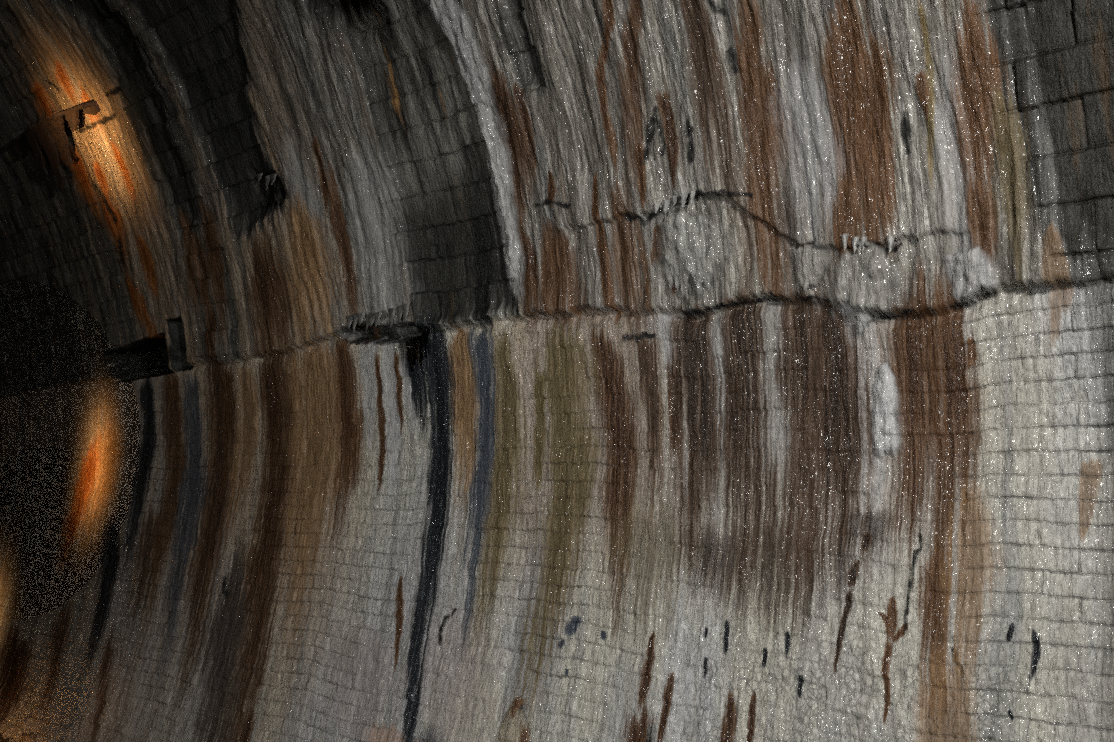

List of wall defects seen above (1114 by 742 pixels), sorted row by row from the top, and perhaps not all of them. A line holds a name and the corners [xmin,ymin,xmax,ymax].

spalling [63,0,204,232]
spalling [104,316,193,383]
rust [180,136,379,742]
rust [375,352,403,488]
leakage [371,313,455,742]
leakage [463,327,495,641]
crack [624,189,753,225]
rust [447,0,992,742]
crack [684,291,911,320]
crack [869,241,903,252]
crack [953,292,996,309]
rust [951,0,1027,280]